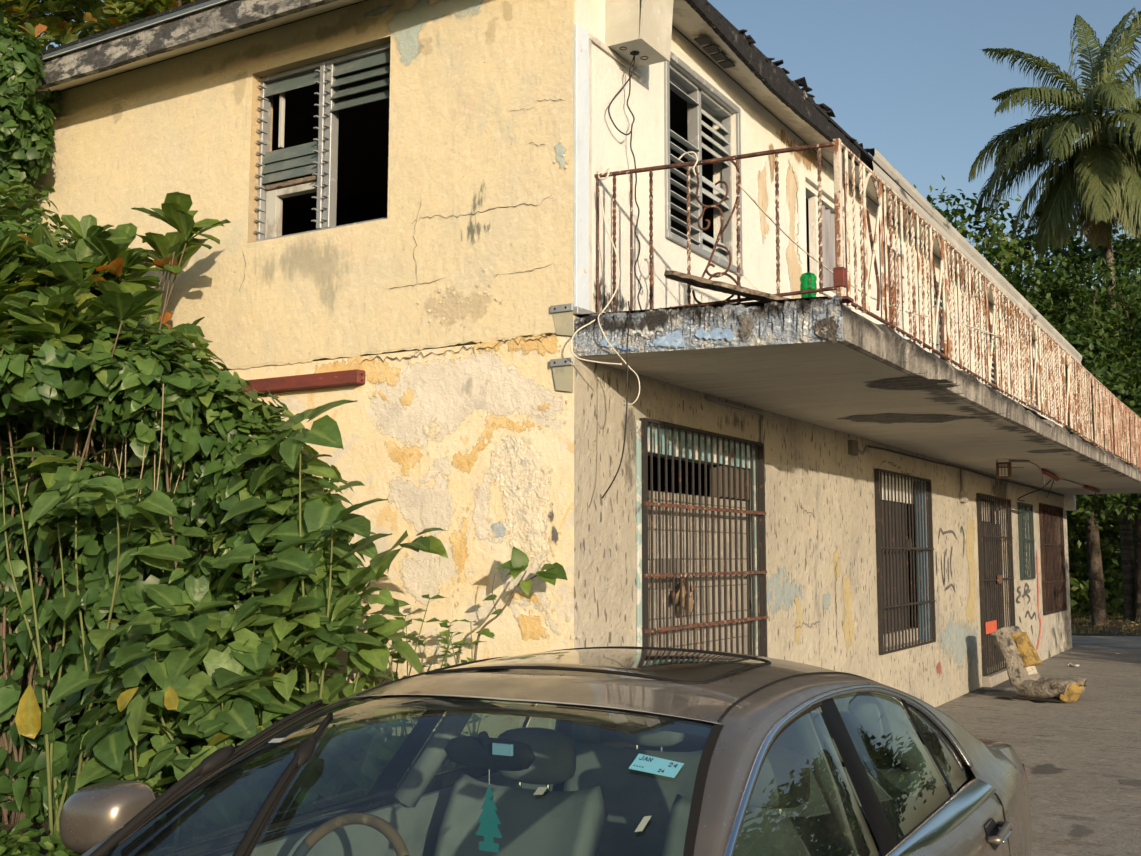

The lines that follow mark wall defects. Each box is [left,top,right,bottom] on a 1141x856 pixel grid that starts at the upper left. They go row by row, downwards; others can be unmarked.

peeling [364,0,482,64]
crack [385,197,548,289]
peeling [599,314,754,351]
spalling [813,315,839,343]
peeling [314,334,581,640]